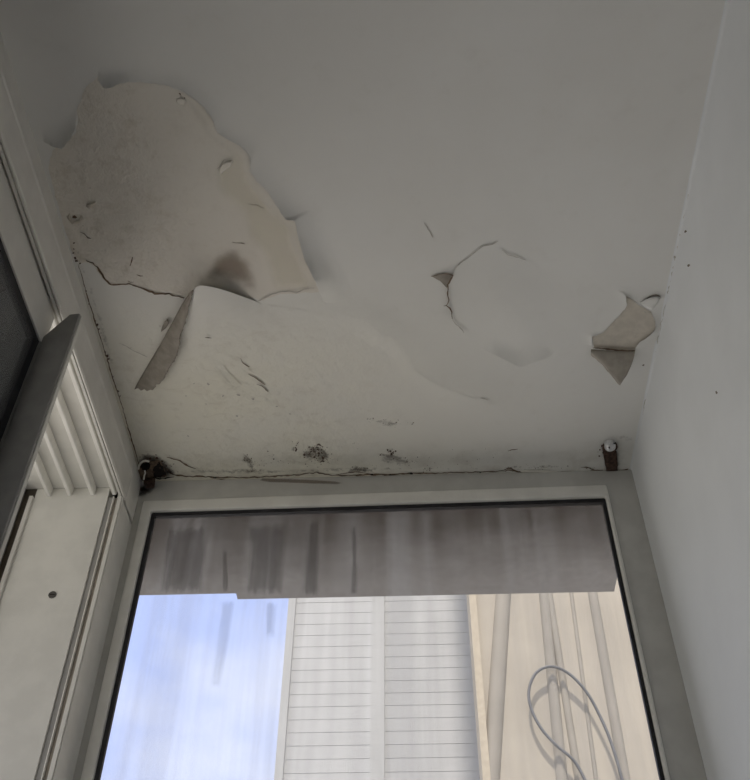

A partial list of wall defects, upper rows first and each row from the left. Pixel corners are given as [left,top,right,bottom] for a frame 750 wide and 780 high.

crack [86,257,184,298]
peeling [40,66,352,391]
peeling [581,286,669,385]
mould [292,441,331,467]